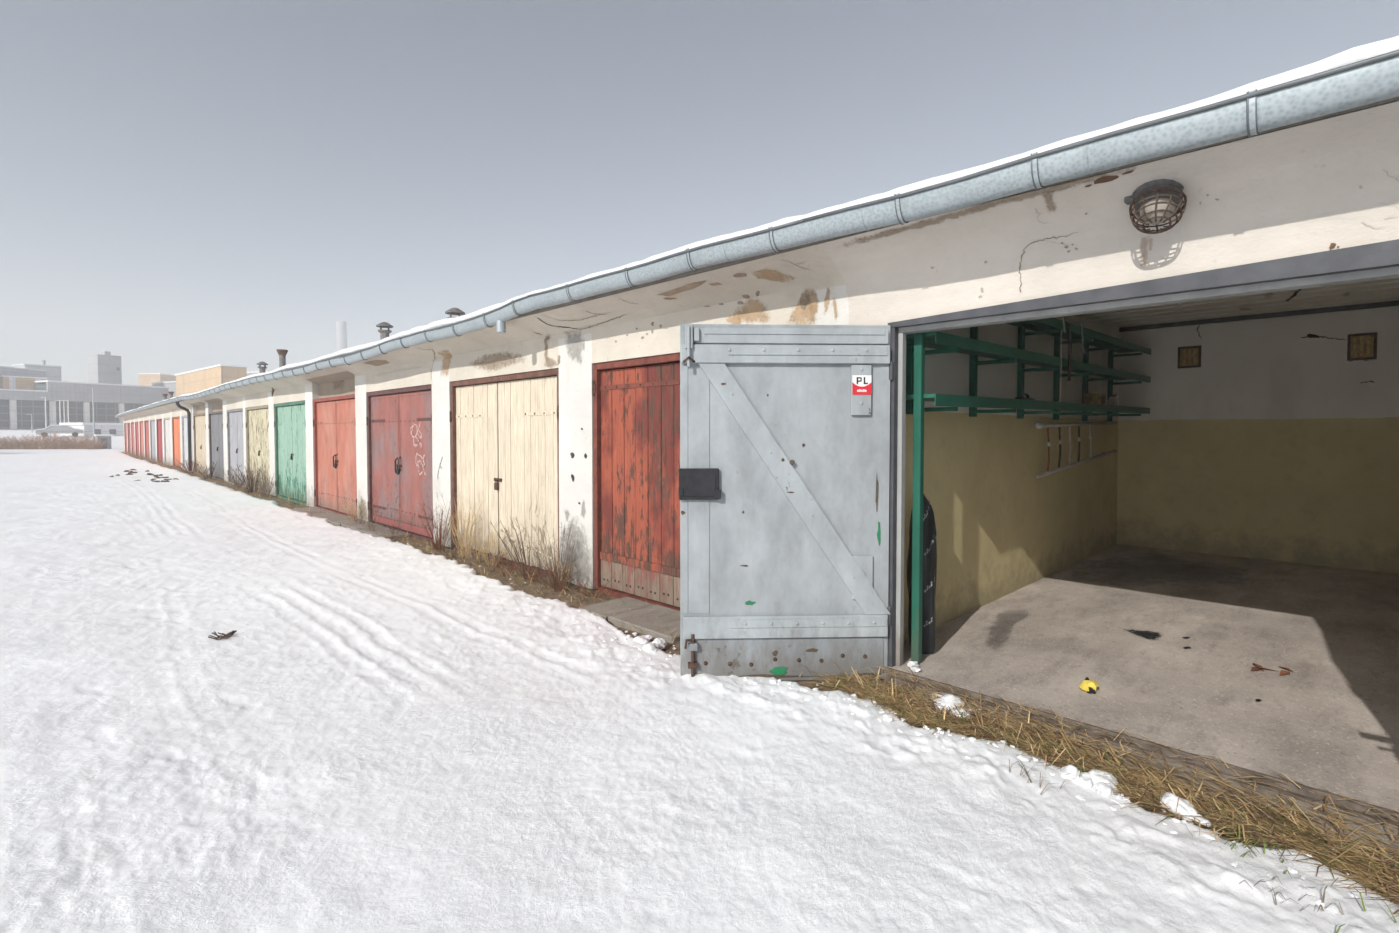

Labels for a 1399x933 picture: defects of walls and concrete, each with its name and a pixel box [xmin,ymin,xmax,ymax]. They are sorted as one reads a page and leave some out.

crack [1019,208,1078,292]